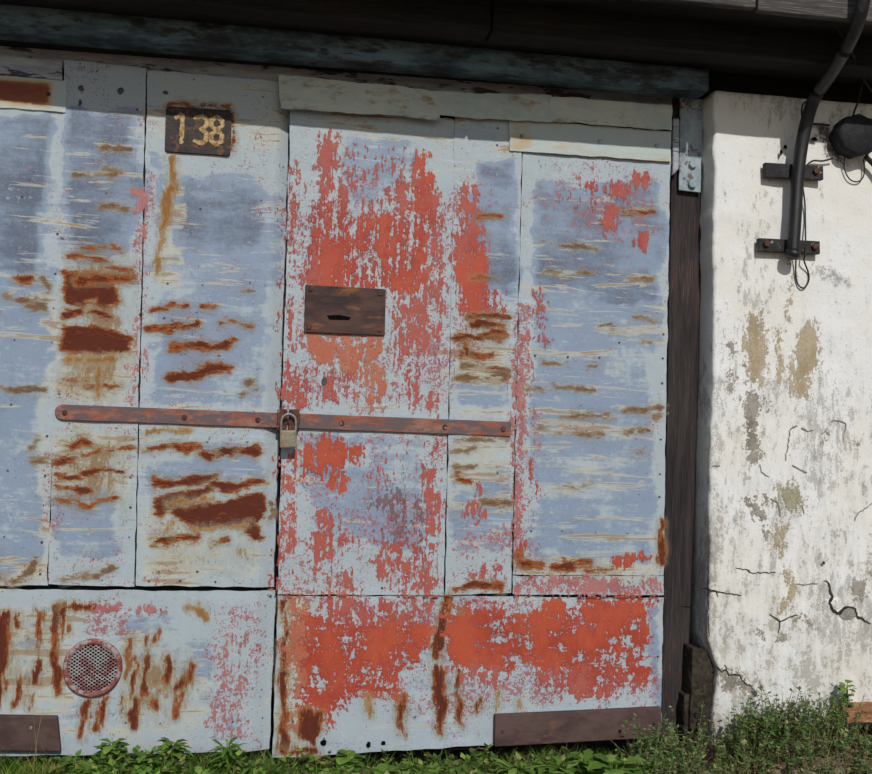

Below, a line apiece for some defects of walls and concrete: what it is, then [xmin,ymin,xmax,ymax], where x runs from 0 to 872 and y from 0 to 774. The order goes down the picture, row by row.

peeling [562,169,652,240]
peeling [273,126,508,419]
rust [0,243,138,400]
peeling [724,338,774,465]
rust [27,425,263,514]
rust [150,473,278,560]
peeling [268,286,666,740]
crack [785,420,847,473]
crack [696,553,741,637]
crack [796,580,871,624]
rust [0,600,96,712]
crack [716,665,752,688]